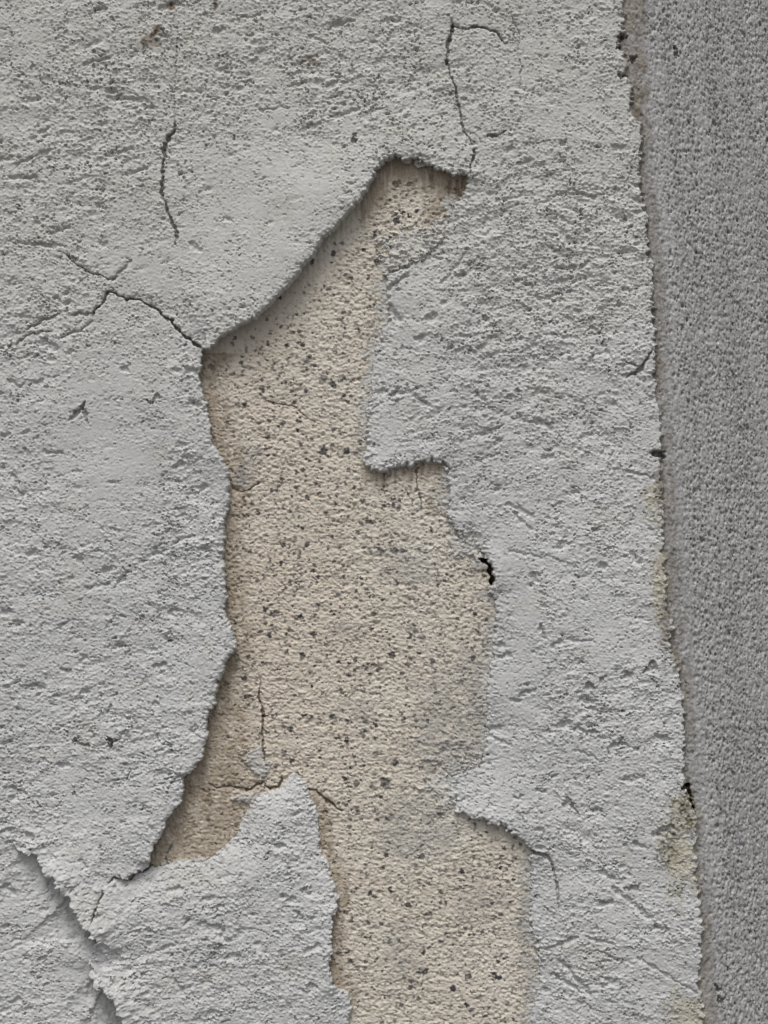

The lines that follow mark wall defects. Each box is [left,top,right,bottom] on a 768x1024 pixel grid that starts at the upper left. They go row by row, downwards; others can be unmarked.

crack [159,25,179,245]
crack [444,4,523,173]
crack [15,239,202,348]
spalling [148,157,541,1024]